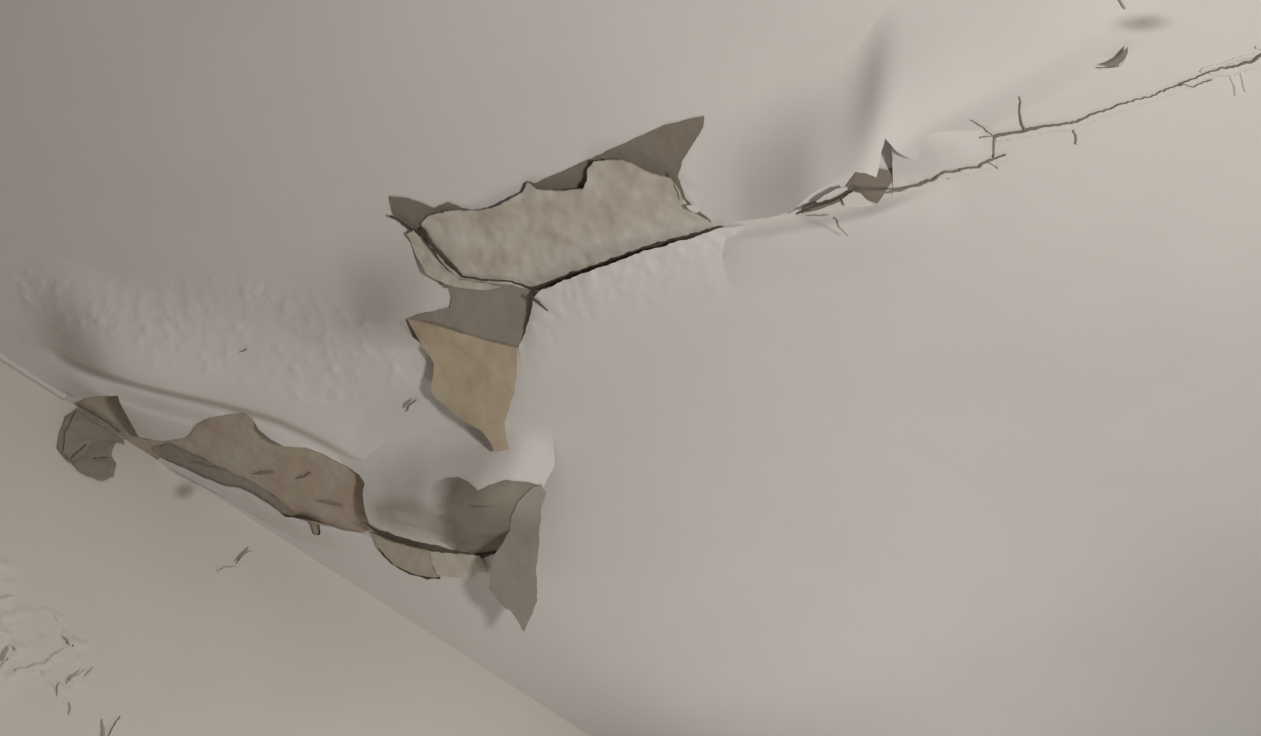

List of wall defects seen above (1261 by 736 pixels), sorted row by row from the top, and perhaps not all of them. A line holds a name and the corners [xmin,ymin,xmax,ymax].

peeling [389,116,747,452]
crack [722,45,1261,296]
peeling [57,396,546,632]